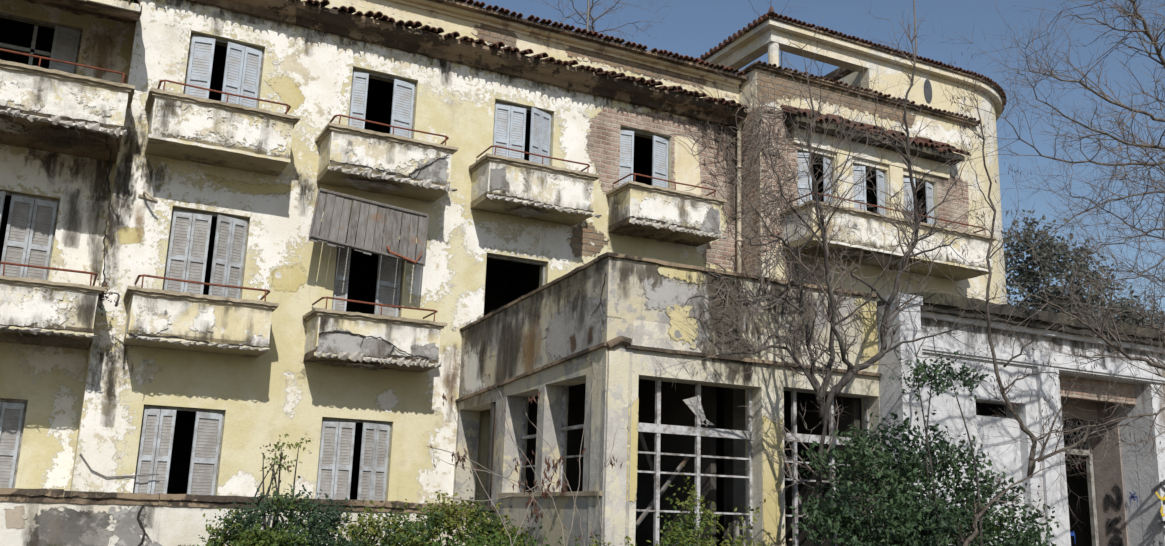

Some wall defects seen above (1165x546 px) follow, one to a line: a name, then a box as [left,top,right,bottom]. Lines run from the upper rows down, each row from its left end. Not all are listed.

damp [413,53,450,82]
damp [5,115,166,277]
peeling [0,0,991,504]
damp [0,292,128,422]
damp [446,258,824,407]
flaking render [3,503,162,546]
crack [137,505,150,546]